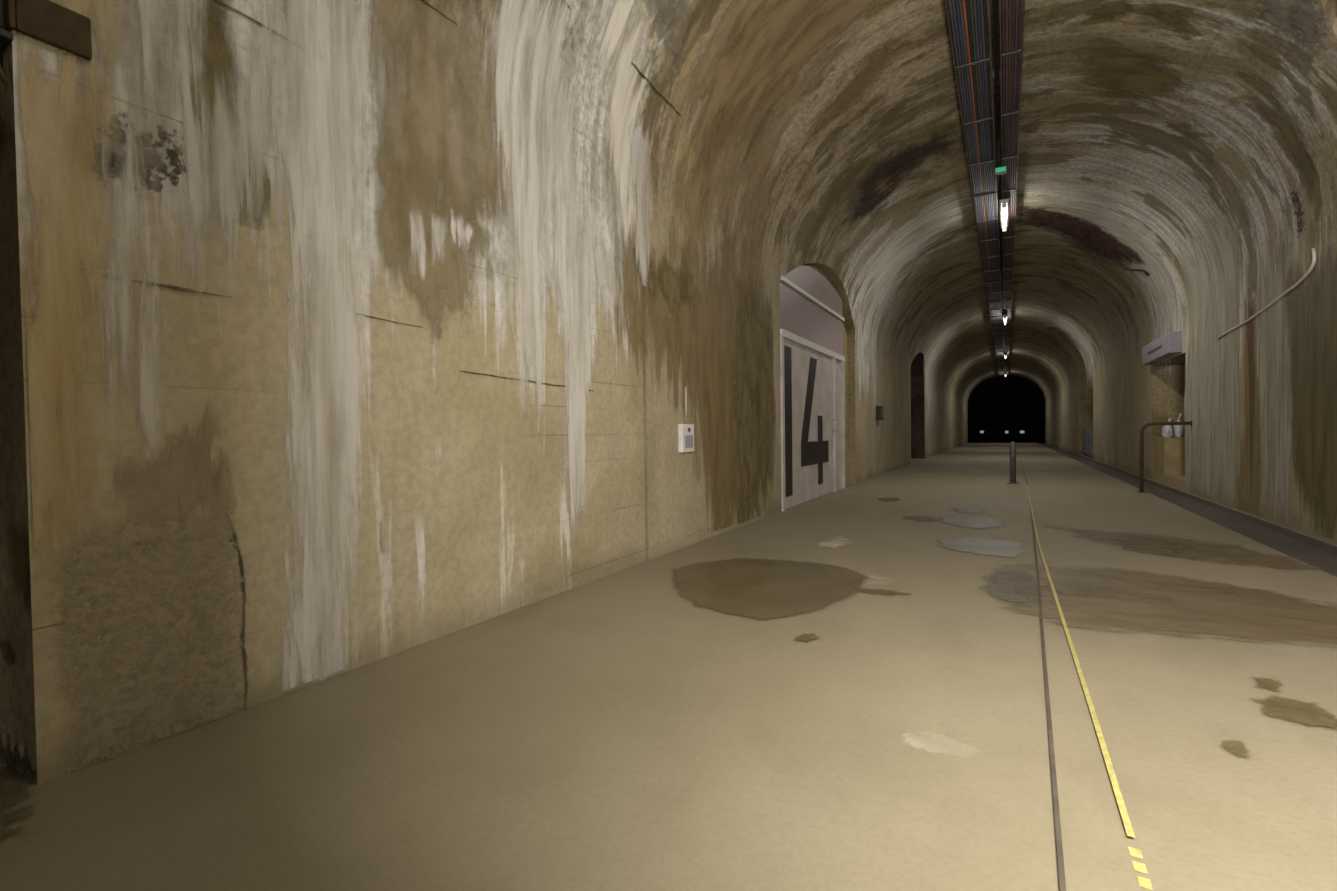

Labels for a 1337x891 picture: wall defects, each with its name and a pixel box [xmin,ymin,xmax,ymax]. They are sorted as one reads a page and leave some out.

leakage [1242,0,1326,57]
leakage [91,0,776,690]
leakage [8,526,27,598]
leakage [983,563,1337,642]